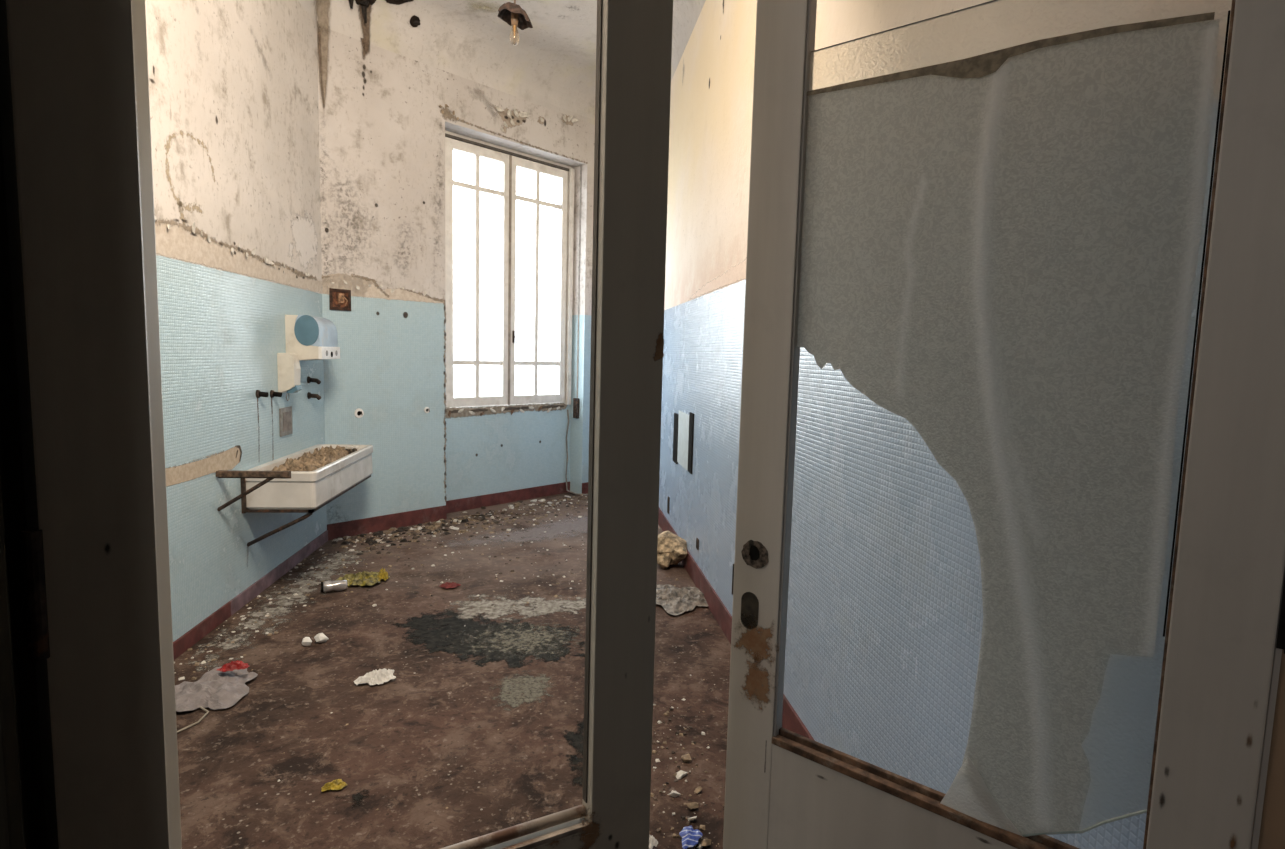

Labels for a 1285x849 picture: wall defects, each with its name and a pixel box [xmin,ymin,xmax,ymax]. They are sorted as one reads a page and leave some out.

leakage [358,5,372,96]
peeling [734,626,777,710]